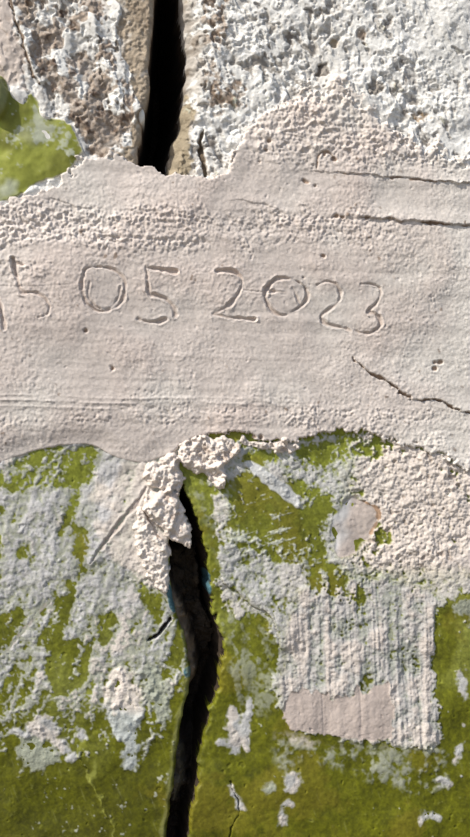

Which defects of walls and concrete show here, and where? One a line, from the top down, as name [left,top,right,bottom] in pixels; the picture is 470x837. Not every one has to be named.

spalling [0,0,154,201]
crack [137,0,186,176]
crack [197,129,208,178]
spalling [314,61,331,78]
crack [357,215,470,228]
crack [352,356,470,415]
leakage [212,459,310,564]
leakage [0,565,183,757]
peeling [74,726,117,837]
peeling [158,627,191,837]
crack [146,485,282,837]
flaking render [257,430,470,810]